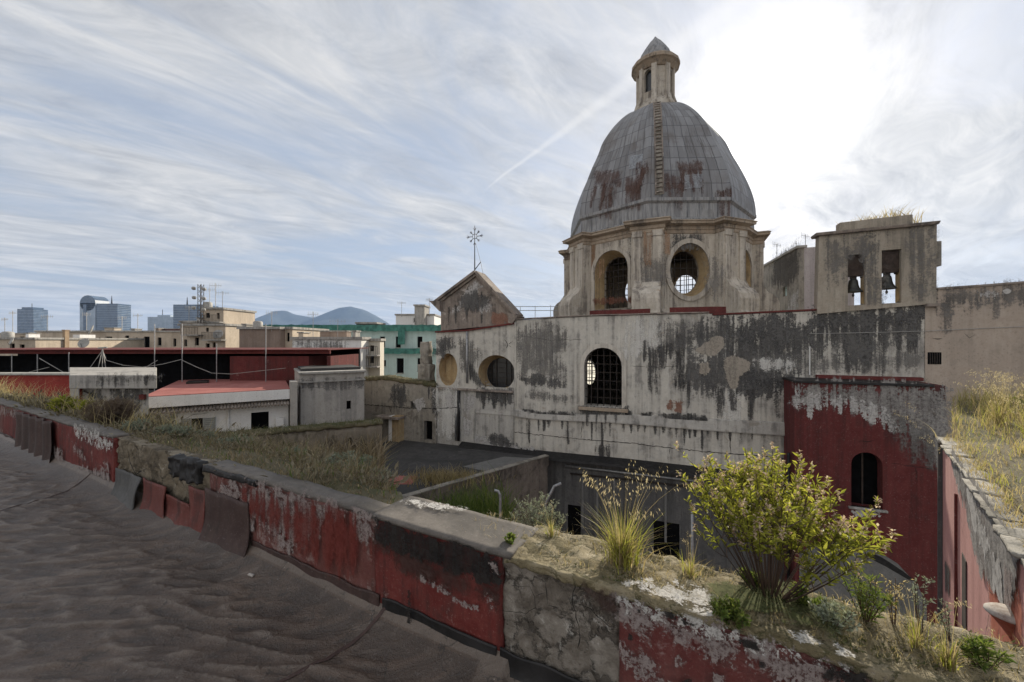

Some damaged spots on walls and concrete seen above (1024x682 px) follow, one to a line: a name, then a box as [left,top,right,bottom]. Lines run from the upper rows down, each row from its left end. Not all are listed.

rust [590,162,649,219]
rust [665,161,704,206]
leakage [433,223,1024,457]
flaking render [52,436,336,555]
peeling [352,518,374,546]
peeling [787,377,1018,615]